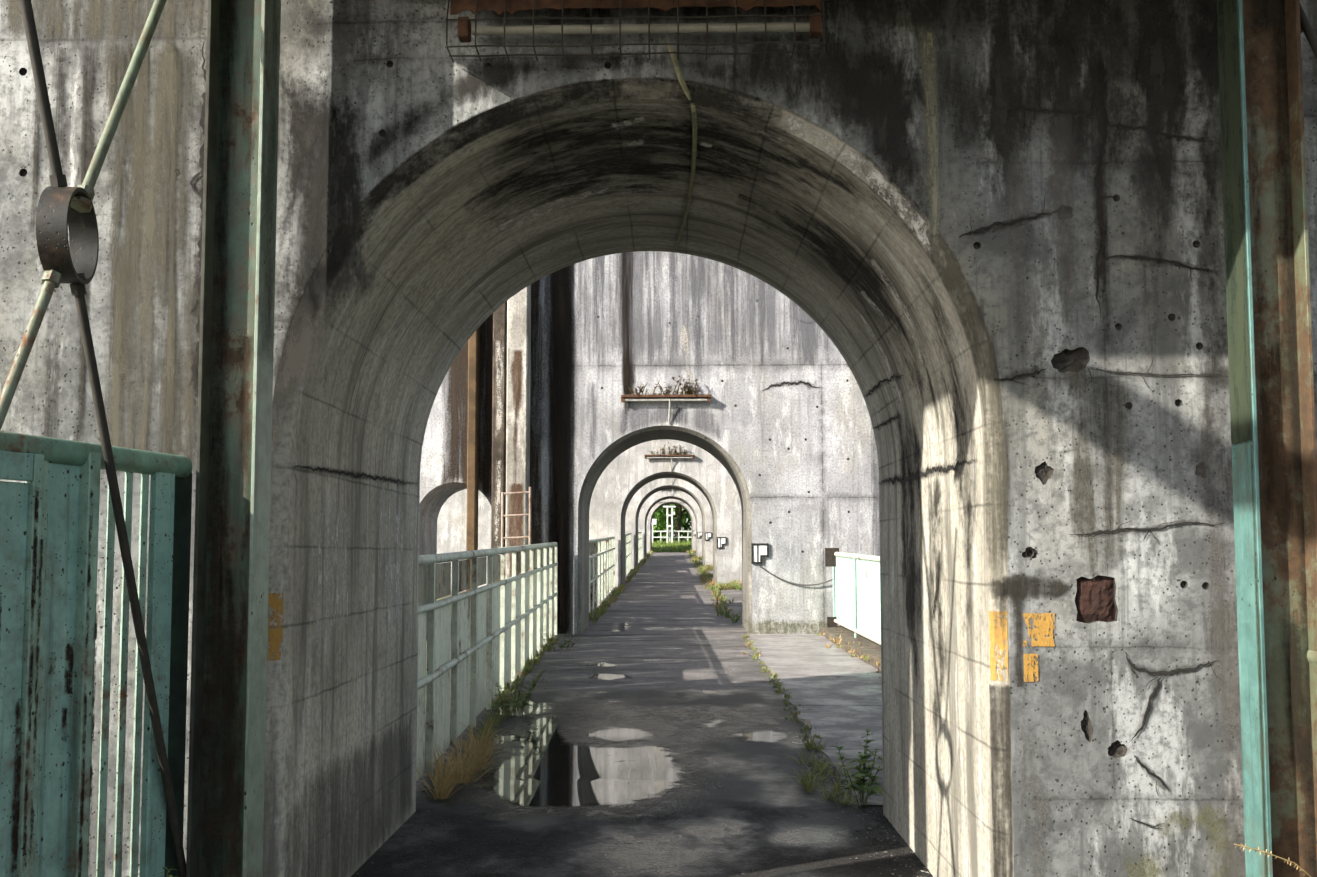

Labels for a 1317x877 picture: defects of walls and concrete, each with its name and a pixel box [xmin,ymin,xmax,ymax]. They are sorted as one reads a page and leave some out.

rust [200,0,251,877]
water stain [274,0,1221,877]
crack [879,438,977,492]
spalling [1034,461,1054,485]
spalling [1051,347,1090,373]
rust [1075,575,1116,623]
crack [1069,520,1226,544]
water stain [1196,332,1241,744]
rust [1251,0,1305,554]
crack [1125,652,1223,829]
water stain [1227,777,1246,877]
rust [1284,571,1317,877]